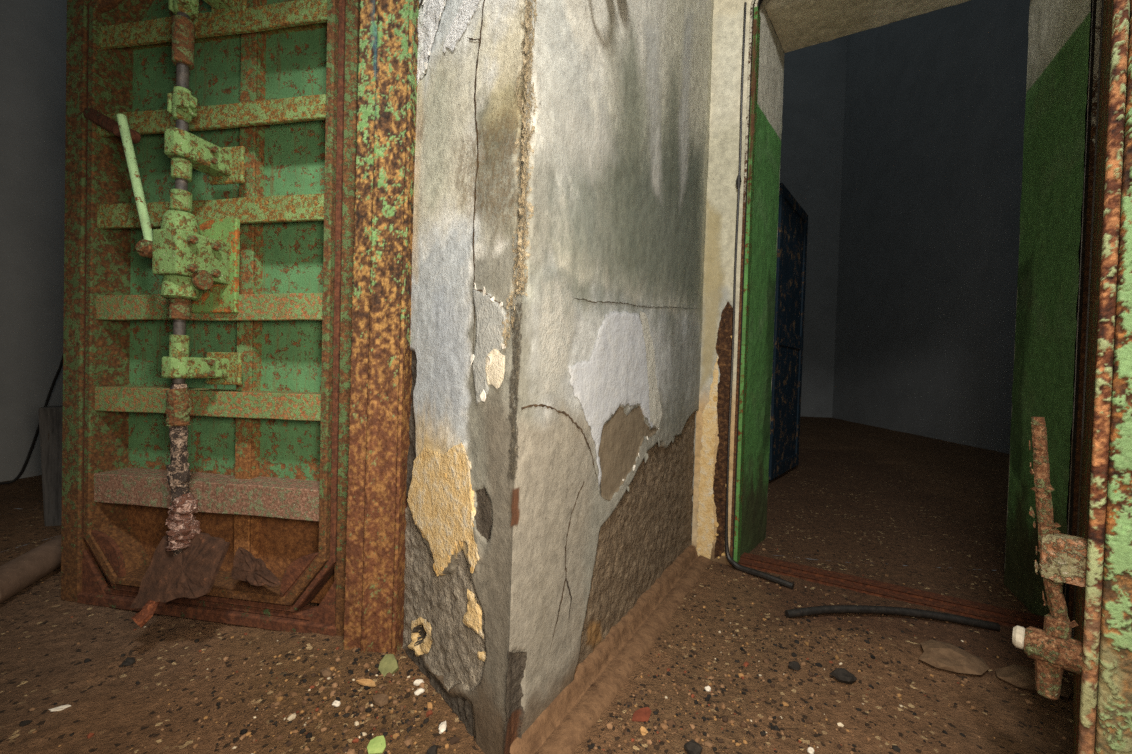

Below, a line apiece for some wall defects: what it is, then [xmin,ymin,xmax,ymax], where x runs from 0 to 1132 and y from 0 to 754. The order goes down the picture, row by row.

crack [467,0,505,349]
leakage [560,99,607,166]
leakage [644,22,660,192]
leakage [680,16,692,188]
spalling [470,0,696,666]
corrosion [231,547,281,587]
spalling [402,350,492,744]